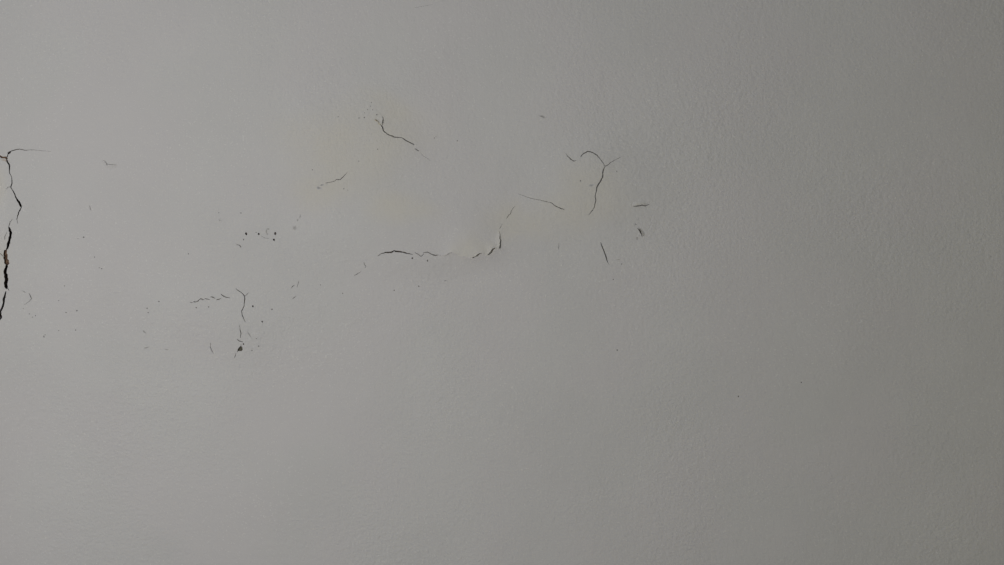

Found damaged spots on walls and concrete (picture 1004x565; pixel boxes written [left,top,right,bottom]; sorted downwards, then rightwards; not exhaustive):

crack [566,151,615,213]
crack [0,149,51,320]
crack [190,290,247,342]